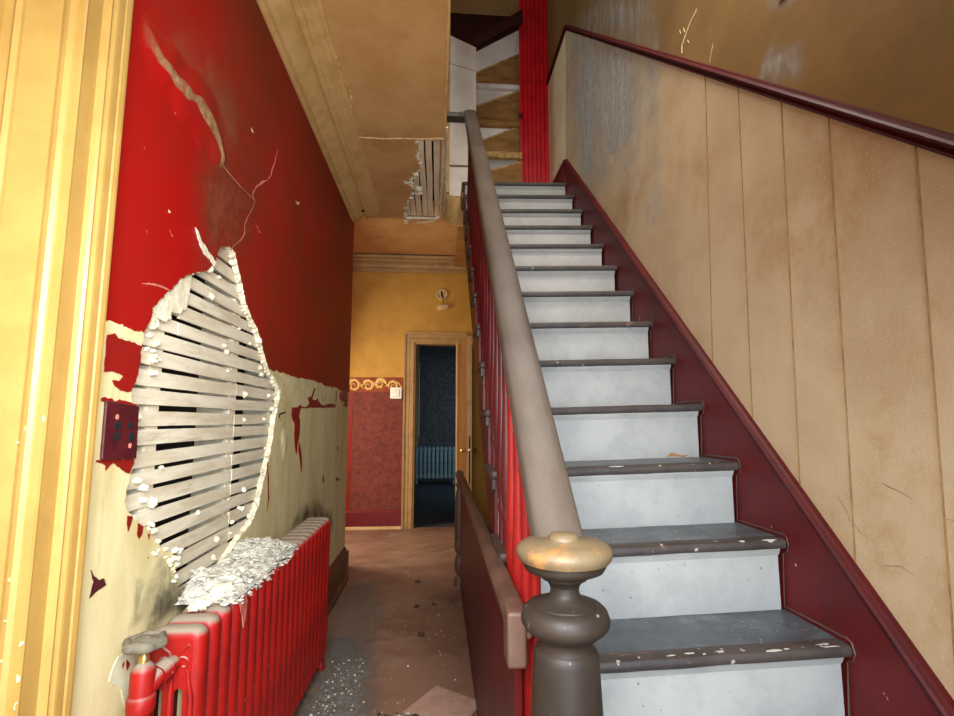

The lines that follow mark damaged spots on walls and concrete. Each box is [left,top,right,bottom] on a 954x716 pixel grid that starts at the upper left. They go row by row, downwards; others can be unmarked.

crack [223,150,278,250]
spalling [403,140,440,201]
flaking render [96,227,279,594]
damp [135,560,179,621]